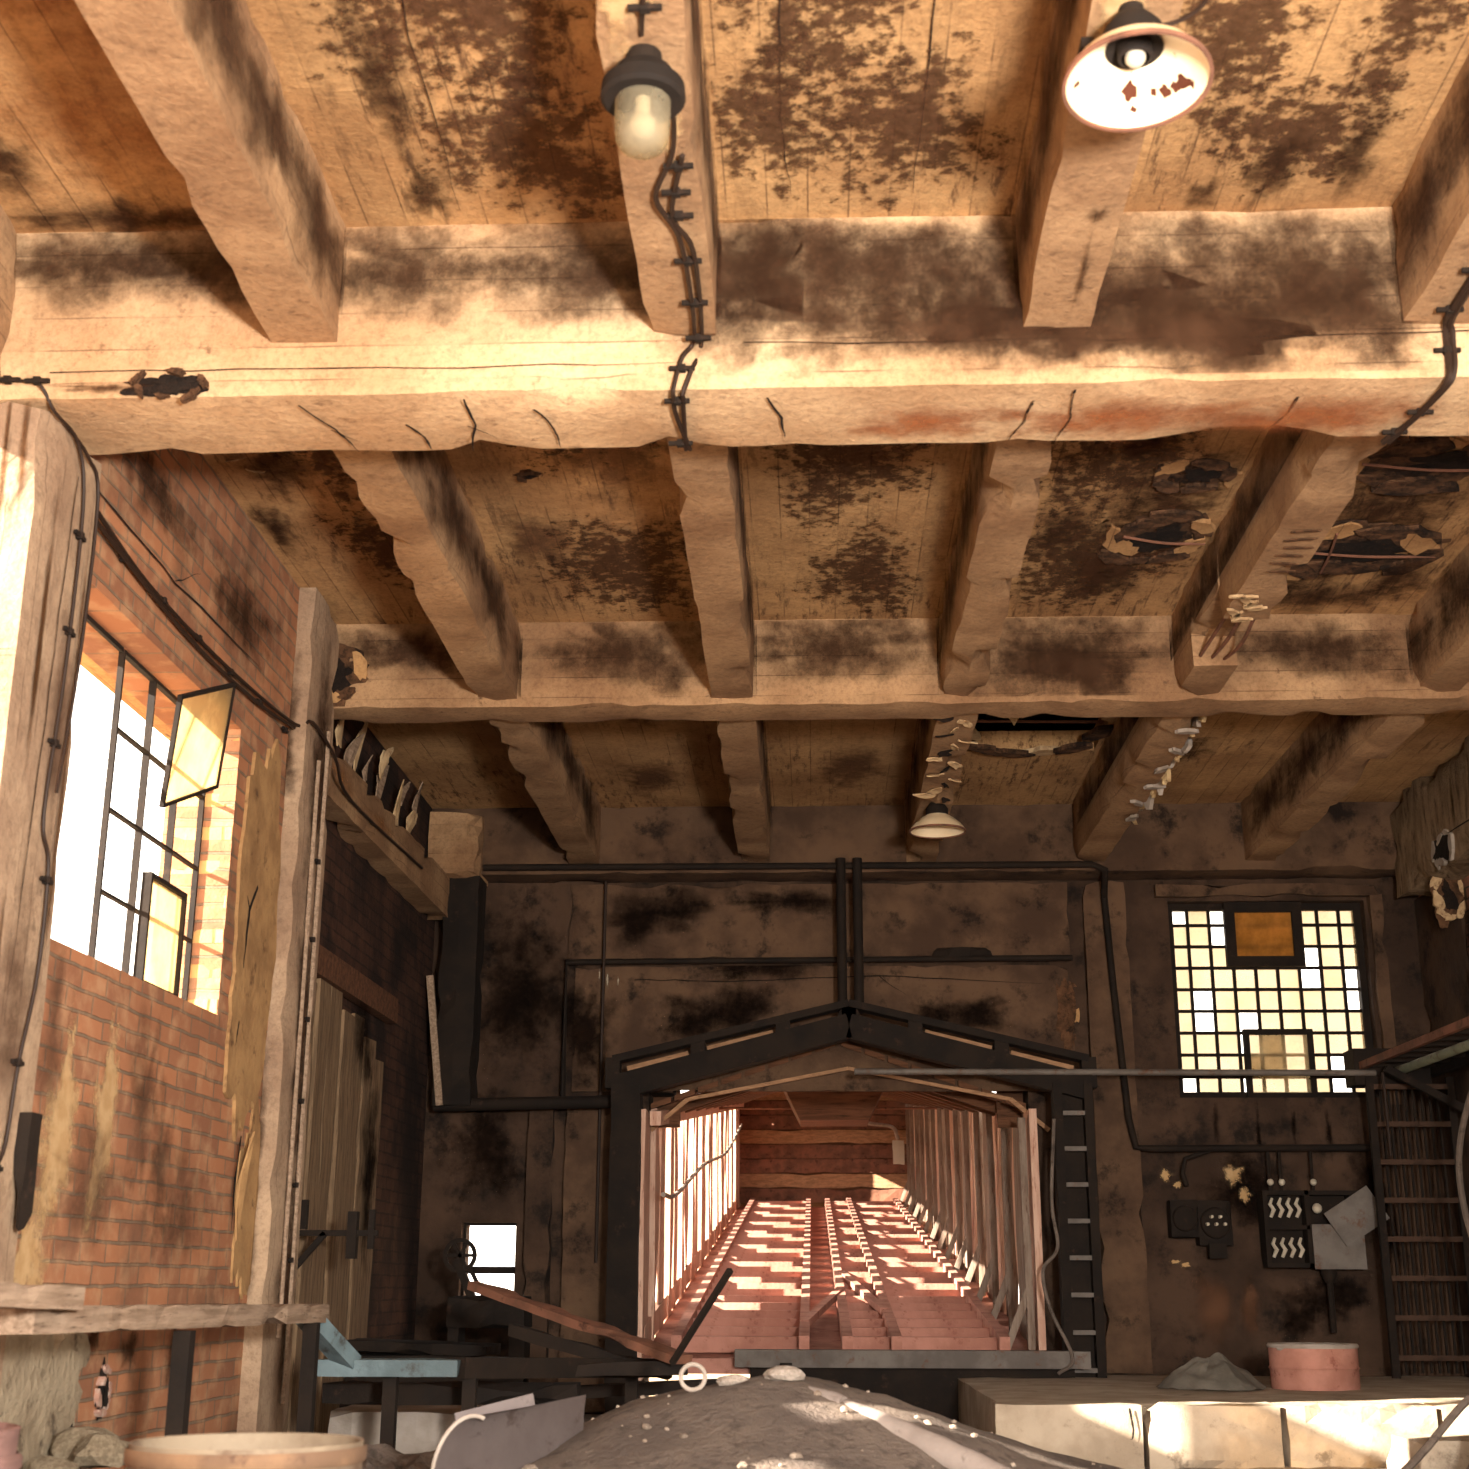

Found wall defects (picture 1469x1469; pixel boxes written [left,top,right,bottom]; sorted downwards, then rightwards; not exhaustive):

water stain [296,0,639,221]
water stain [656,118,681,150]
water stain [711,0,1017,211]
water stain [1177,0,1469,199]
water stain [1190,182,1215,204]
water stain [760,443,941,617]
spalling [1097,457,1243,566]
spalling [1266,519,1451,581]
spalling [1356,436,1469,496]
spalling [1199,594,1268,661]